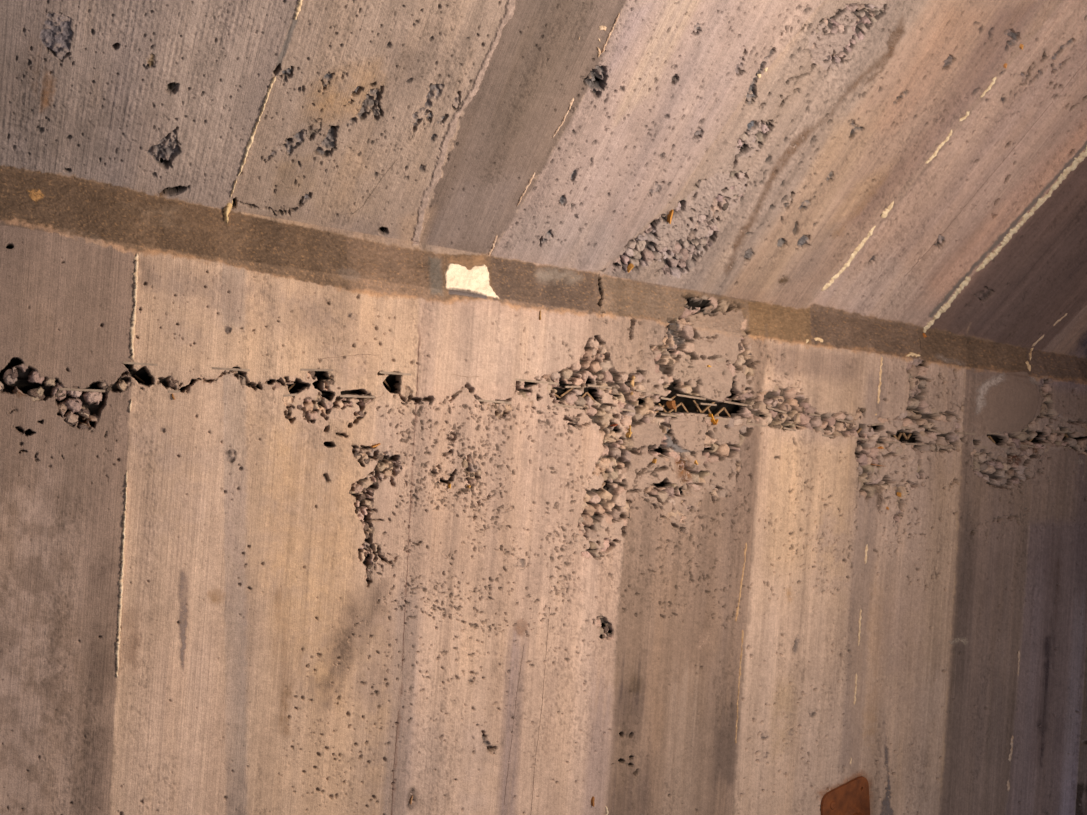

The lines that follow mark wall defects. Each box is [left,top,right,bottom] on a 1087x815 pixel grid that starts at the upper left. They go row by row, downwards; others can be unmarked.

spalling [680,292,743,318]
peeling [923,276,996,333]
crack [105,360,292,395]
crack [314,349,521,665]
hole [372,399,599,639]
spalling [599,431,859,630]
spalling [873,452,960,590]